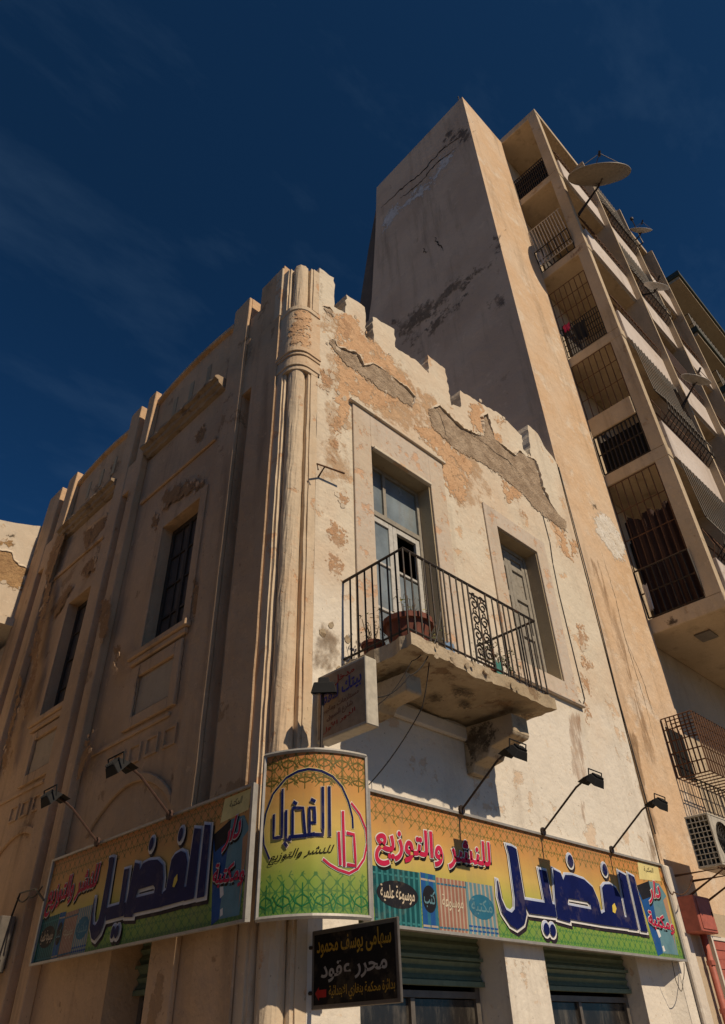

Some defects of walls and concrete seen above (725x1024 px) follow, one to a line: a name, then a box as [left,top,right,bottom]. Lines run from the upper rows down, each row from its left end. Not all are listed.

crack [381,130,467,208]
flaking render [288,305,578,562]
flaking render [0,538,31,591]
peeling [325,519,349,581]